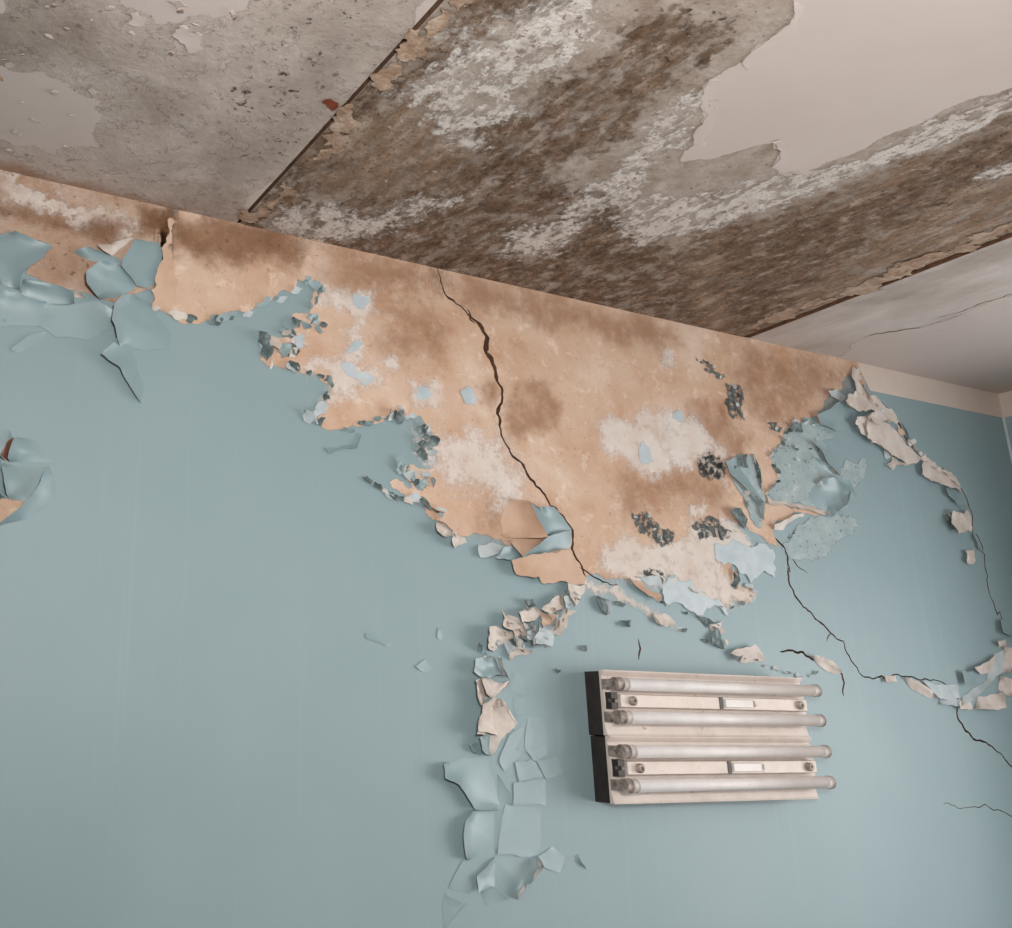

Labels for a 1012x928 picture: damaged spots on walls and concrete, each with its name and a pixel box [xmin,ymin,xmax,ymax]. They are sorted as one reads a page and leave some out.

leakage [0,0,1012,337]
peeling [0,0,1012,661]
crack [437,268,616,586]
peeling [444,642,565,906]
peeling [729,644,843,678]
crack [775,538,1012,767]
peeling [884,619,1012,710]